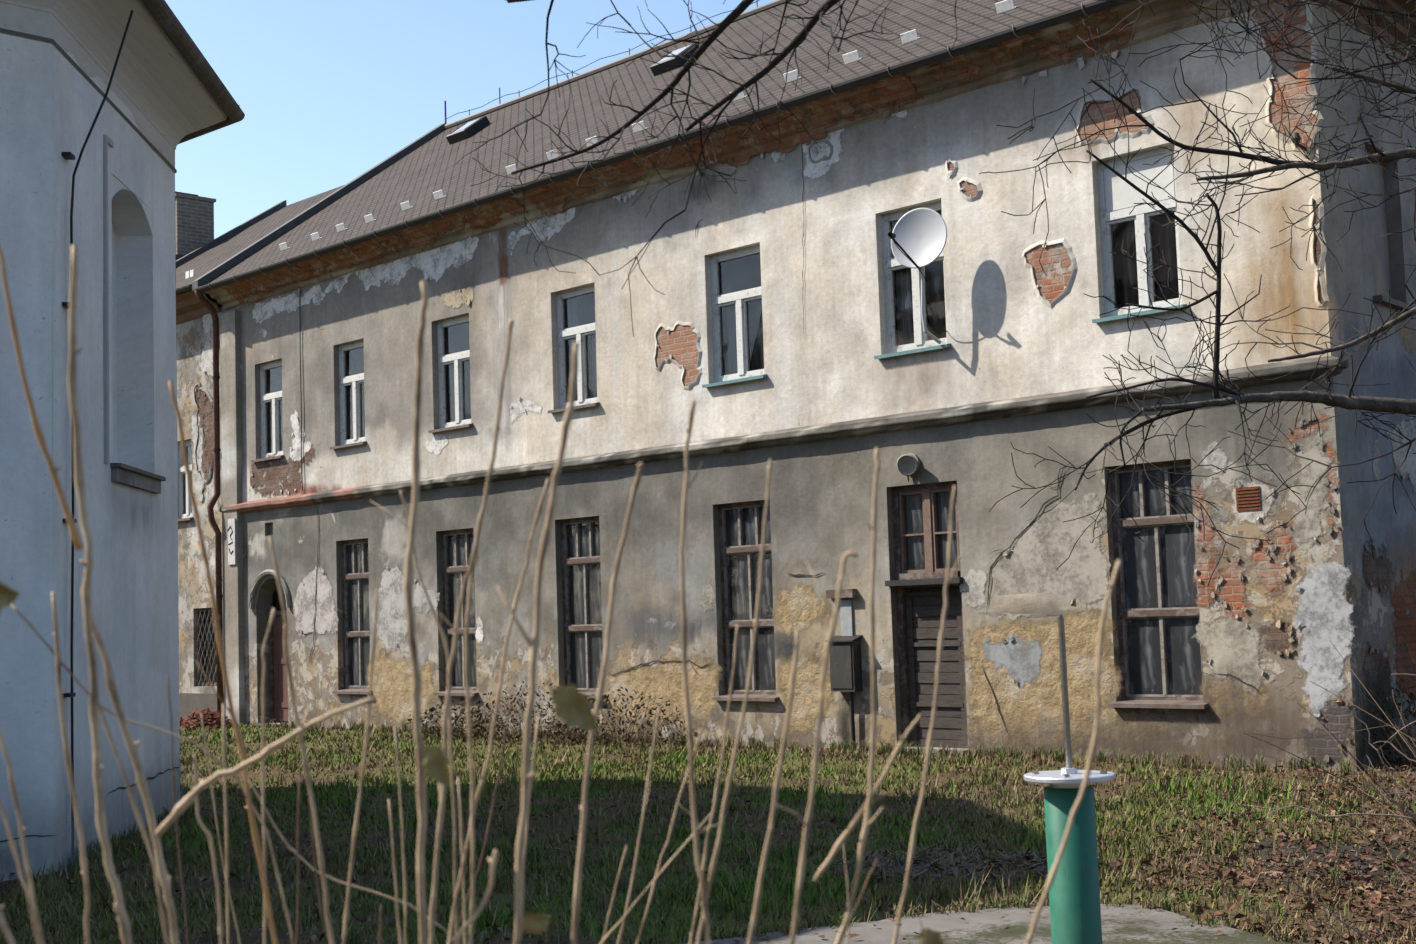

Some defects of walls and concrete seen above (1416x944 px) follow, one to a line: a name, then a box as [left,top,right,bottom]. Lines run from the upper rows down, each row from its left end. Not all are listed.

flaking render [1247,0,1323,159]
flaking render [1075,85,1154,147]
peeling [760,128,845,180]
flaking render [945,157,983,202]
peeling [252,237,479,338]
flaking render [1021,238,1077,309]
flaking render [653,321,702,391]
peeling [191,314,214,502]
peeling [293,567,339,637]
flaking render [959,493,1170,756]
peeling [1194,411,1416,768]
crack [610,660,713,675]